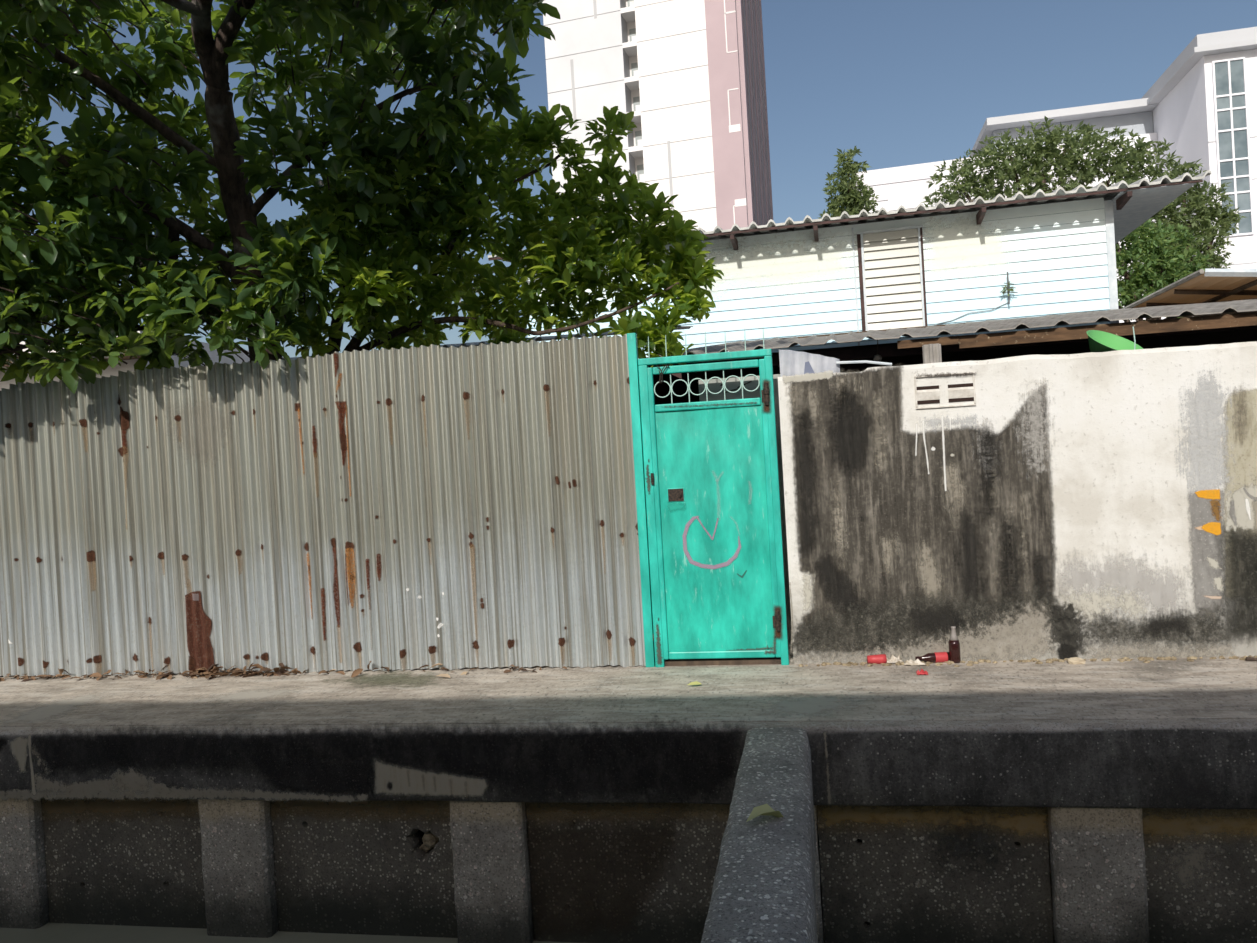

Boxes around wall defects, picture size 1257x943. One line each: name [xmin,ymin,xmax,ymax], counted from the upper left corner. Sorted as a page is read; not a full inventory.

corrosion [118,397,129,457]
leakage [789,365,1257,664]
peeling [1179,371,1257,617]
corrosion [304,538,381,654]
leakage [0,695,742,802]